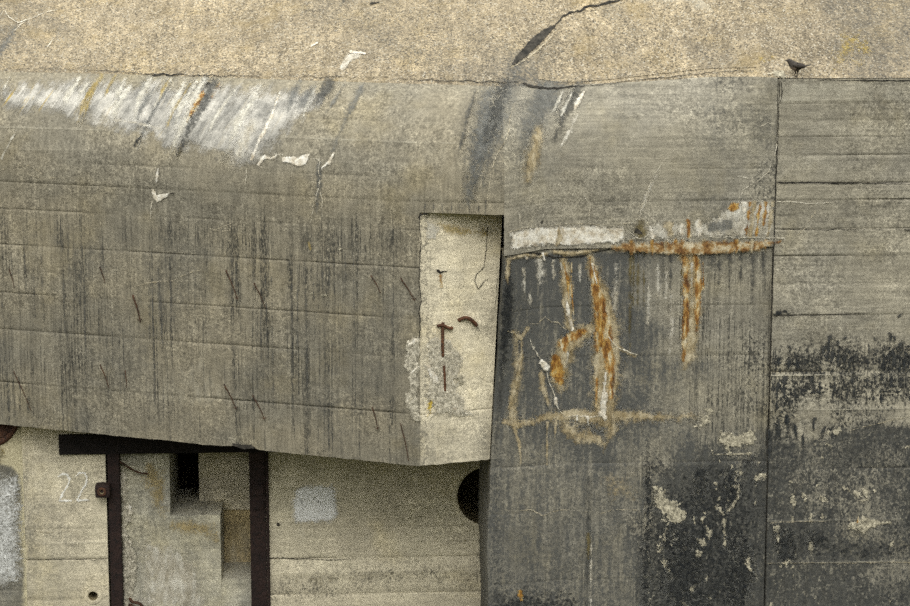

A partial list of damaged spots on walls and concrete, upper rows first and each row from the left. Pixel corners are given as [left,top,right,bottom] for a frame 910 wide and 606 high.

leakage [340,50,366,70]
crack [553,0,620,26]
leakage [3,75,337,164]
spalling [404,316,478,422]
rust [551,254,636,425]
rust [612,220,785,370]
leakage [638,332,910,606]